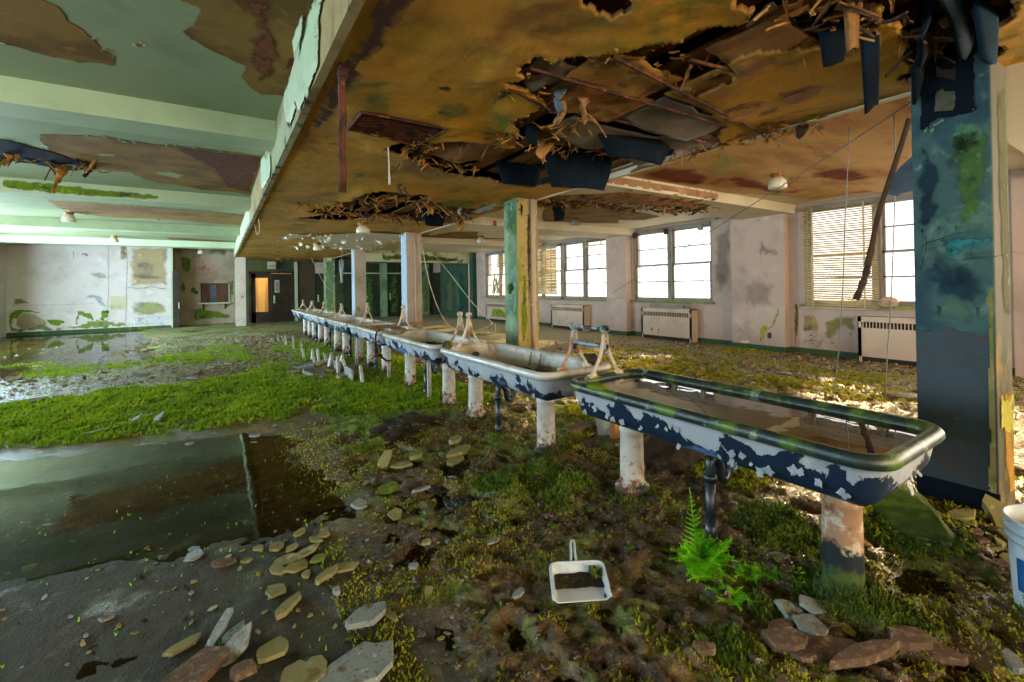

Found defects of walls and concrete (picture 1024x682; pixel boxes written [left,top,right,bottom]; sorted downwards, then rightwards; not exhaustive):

peeling [0,0,115,66]
peeling [181,0,322,128]
corrosion [306,0,415,134]
peeling [39,134,271,194]
peeling [541,42,976,223]
peeling [47,200,250,257]
damp [121,247,166,284]
damp [134,303,168,324]